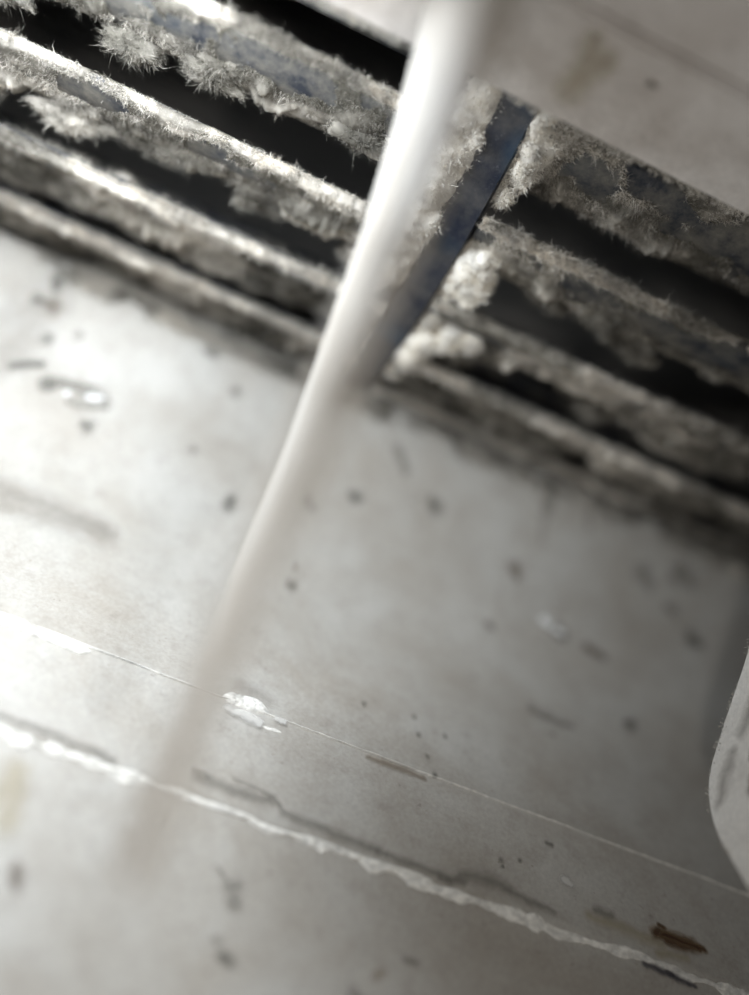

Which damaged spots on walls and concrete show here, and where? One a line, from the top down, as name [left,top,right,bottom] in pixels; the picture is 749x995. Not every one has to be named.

corrosion [651,923,707,953]